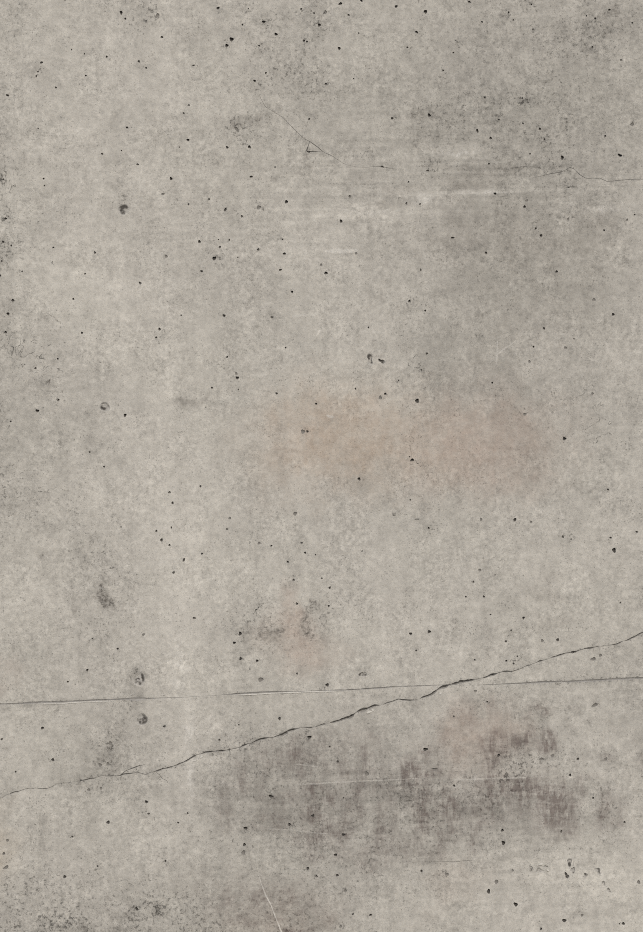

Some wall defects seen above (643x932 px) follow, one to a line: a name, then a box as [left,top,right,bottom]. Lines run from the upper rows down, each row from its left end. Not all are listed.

crack [5,632,643,796]